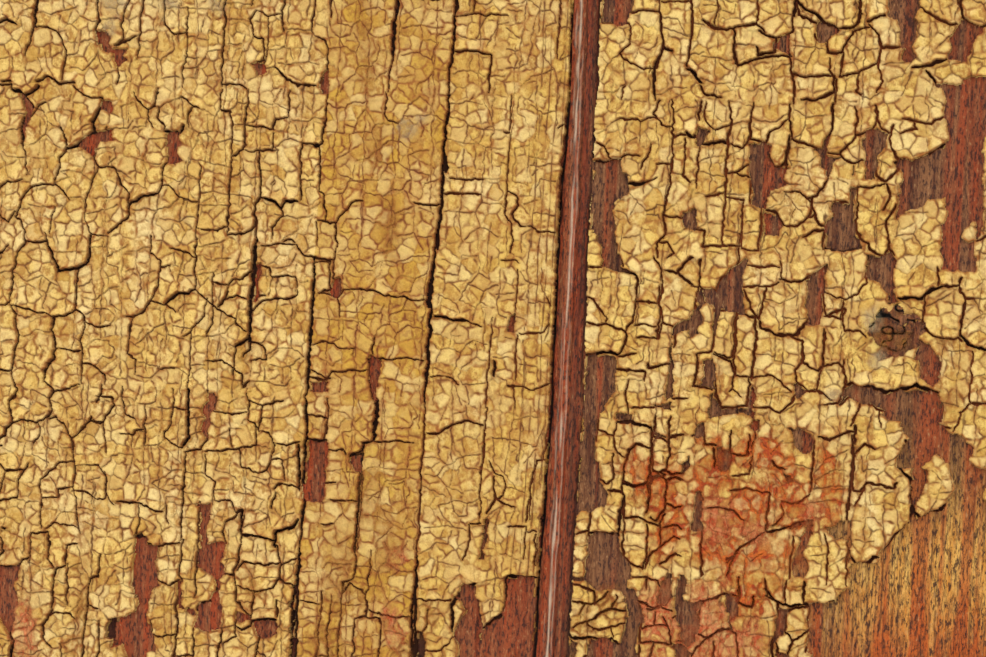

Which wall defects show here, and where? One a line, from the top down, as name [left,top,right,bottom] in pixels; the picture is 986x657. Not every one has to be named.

peeling [568,0,986,657]
crack [569,0,986,657]
peeling [284,422,379,517]
peeling [0,549,35,648]
peeling [67,488,311,657]
peeling [398,501,540,657]